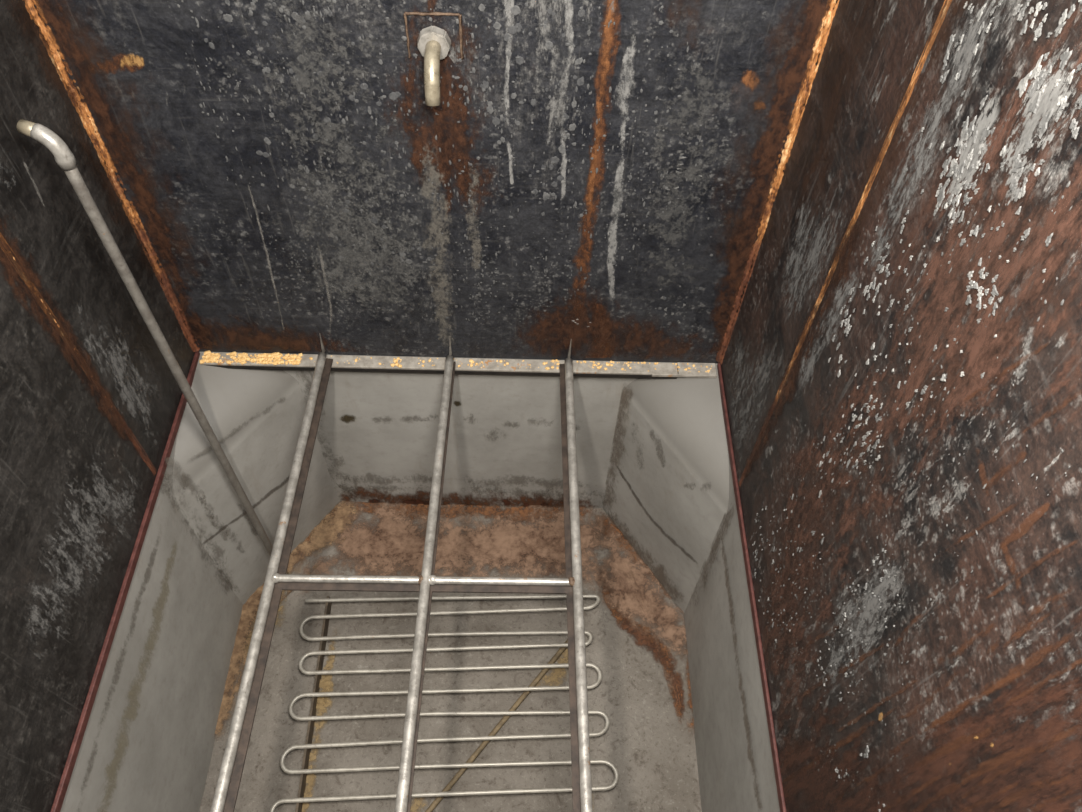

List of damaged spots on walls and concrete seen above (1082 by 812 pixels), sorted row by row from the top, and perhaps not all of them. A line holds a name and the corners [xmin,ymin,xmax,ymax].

rust [34,0,345,352]
rust [397,26,490,212]
water stain [504,0,514,123]
water stain [560,0,574,198]
rust [520,0,697,359]
water stain [607,161,624,298]
water stain [618,41,635,148]
rust [712,0,830,351]
rust [929,0,958,49]
rust [0,219,136,450]
rust [342,487,564,508]
rust [763,11,1082,812]